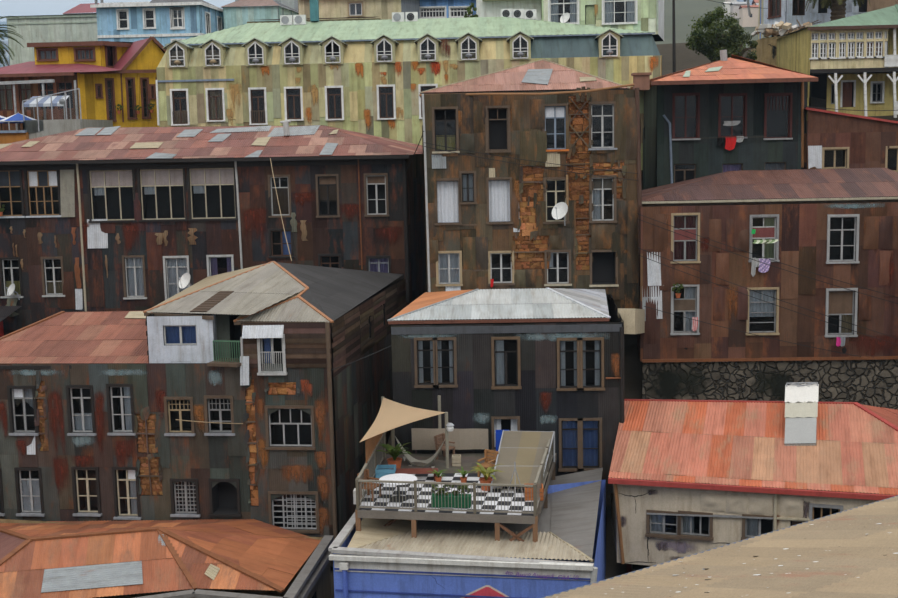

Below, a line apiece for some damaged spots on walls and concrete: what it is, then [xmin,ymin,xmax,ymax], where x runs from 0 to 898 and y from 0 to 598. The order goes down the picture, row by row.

corrosion [381,39,458,85]
corrosion [282,451,328,497]